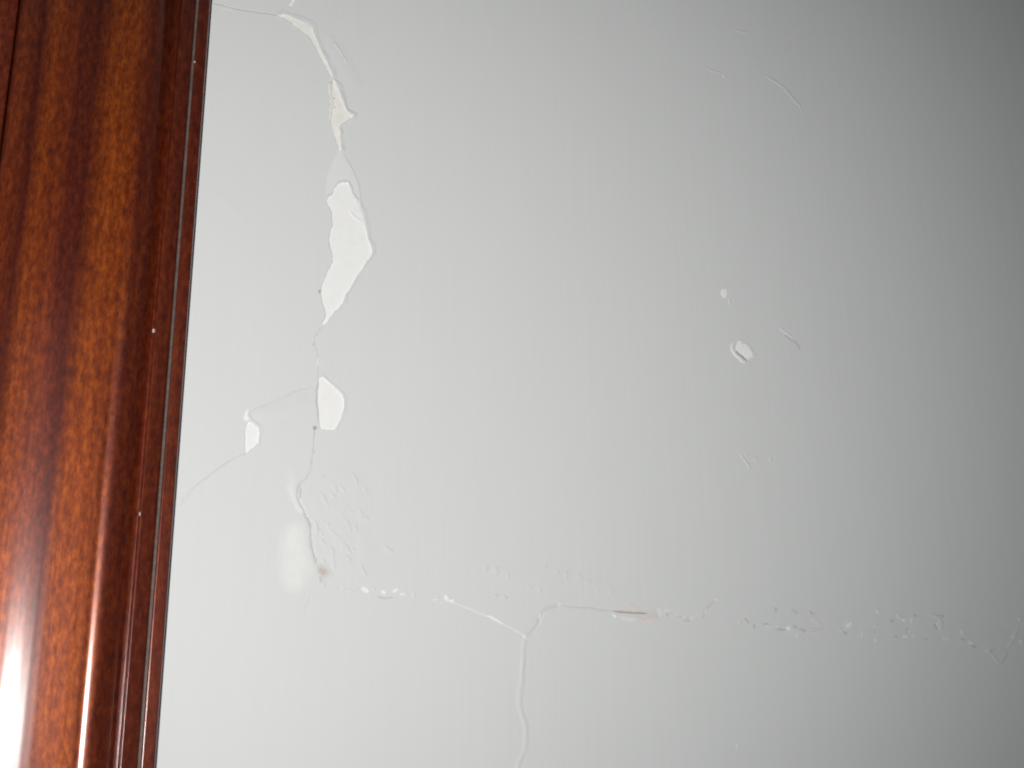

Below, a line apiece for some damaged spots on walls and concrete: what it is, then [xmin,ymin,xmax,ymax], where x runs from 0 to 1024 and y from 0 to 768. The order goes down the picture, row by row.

crack [212,0,317,28]
peeling [275,10,377,327]
spalling [730,338,756,364]
peeling [242,409,263,455]
peeling [313,373,347,433]
crack [289,429,326,616]